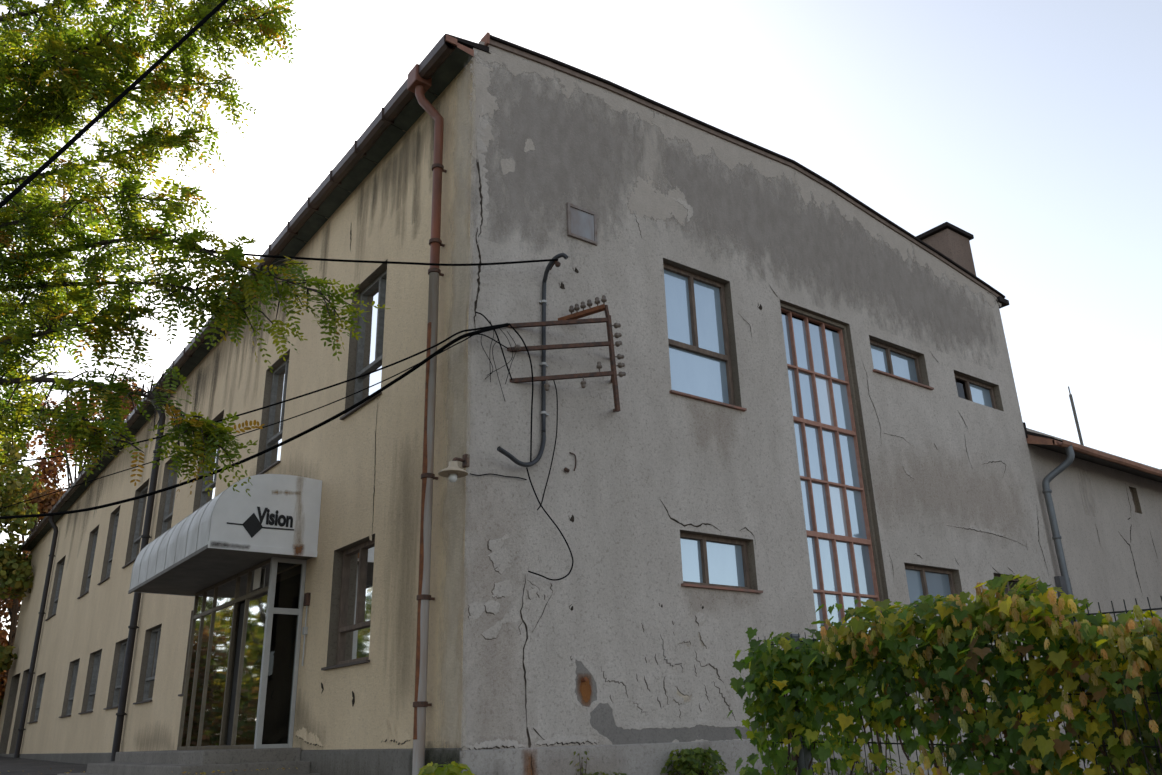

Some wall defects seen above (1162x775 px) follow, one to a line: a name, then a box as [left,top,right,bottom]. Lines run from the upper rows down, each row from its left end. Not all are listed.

crack [473,104,495,331]
water stain [485,73,992,348]
flaking render [441,46,996,750]
crack [660,499,756,544]
crack [519,573,553,775]